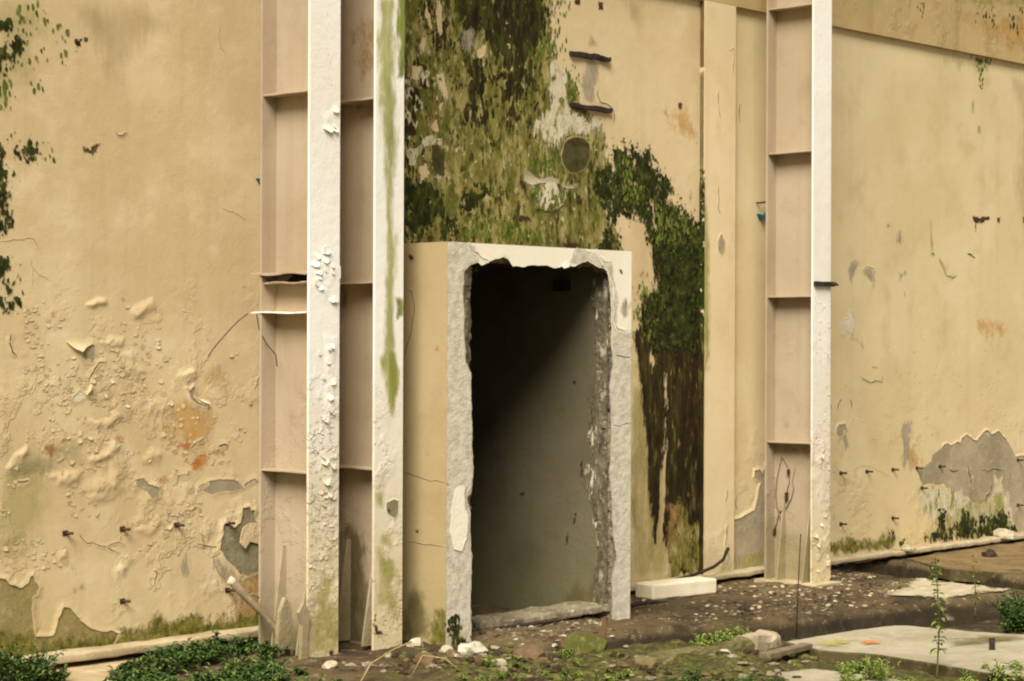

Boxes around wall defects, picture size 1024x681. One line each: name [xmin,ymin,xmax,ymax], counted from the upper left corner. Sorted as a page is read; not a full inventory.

leakage [397,0,604,184]
leakage [632,1,709,577]
peeling [0,300,259,582]
corrosion [176,401,215,469]
peeling [308,331,339,592]
leakage [381,354,398,404]
flaking render [734,460,765,569]
flaking render [917,427,1024,532]
flaking render [0,536,123,657]